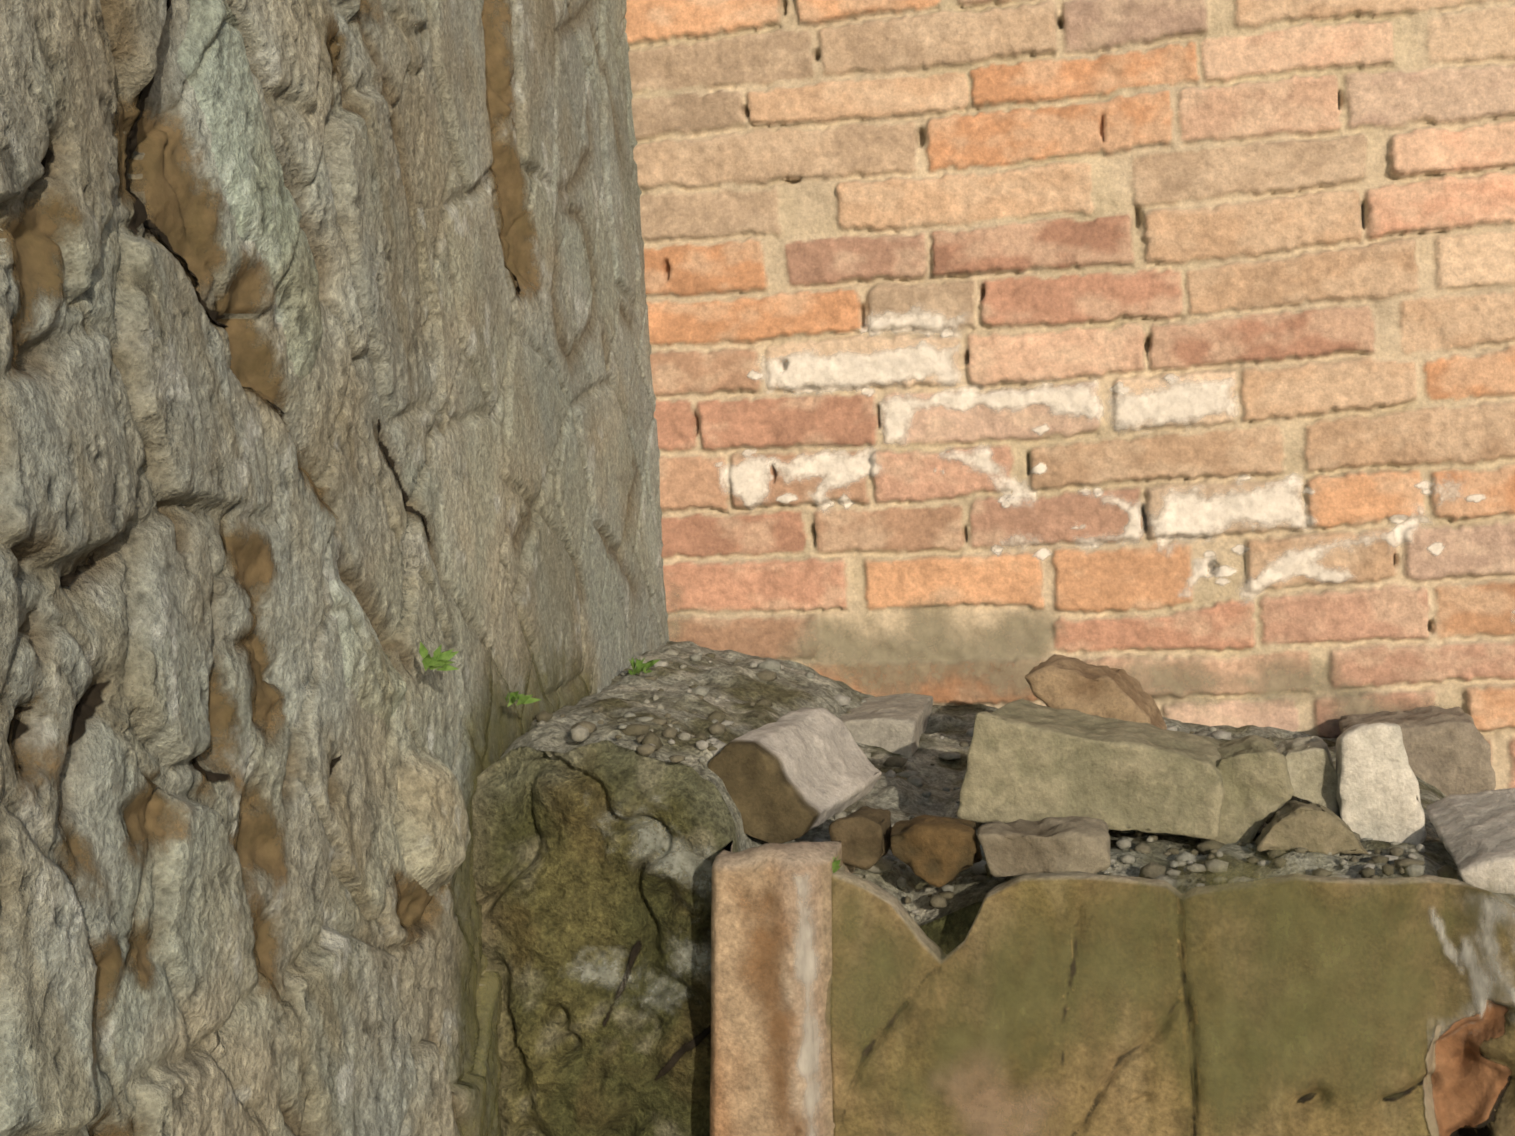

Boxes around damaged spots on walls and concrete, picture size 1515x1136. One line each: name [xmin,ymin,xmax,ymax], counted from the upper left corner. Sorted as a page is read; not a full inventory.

crack [125,76,228,328]
crack [242,387,284,419]
water stain [716,308,1237,510]
water stain [991,536,1051,560]
water stain [1072,473,1486,599]
water stain [1433,902,1505,1013]
crack [1072,1047,1139,1136]
crack [1168,945,1196,1136]
crack [1297,1093,1316,1103]
crack [1383,1079,1424,1101]
spalling [1424,1000,1512,1136]
crack [1465,1053,1512,1129]